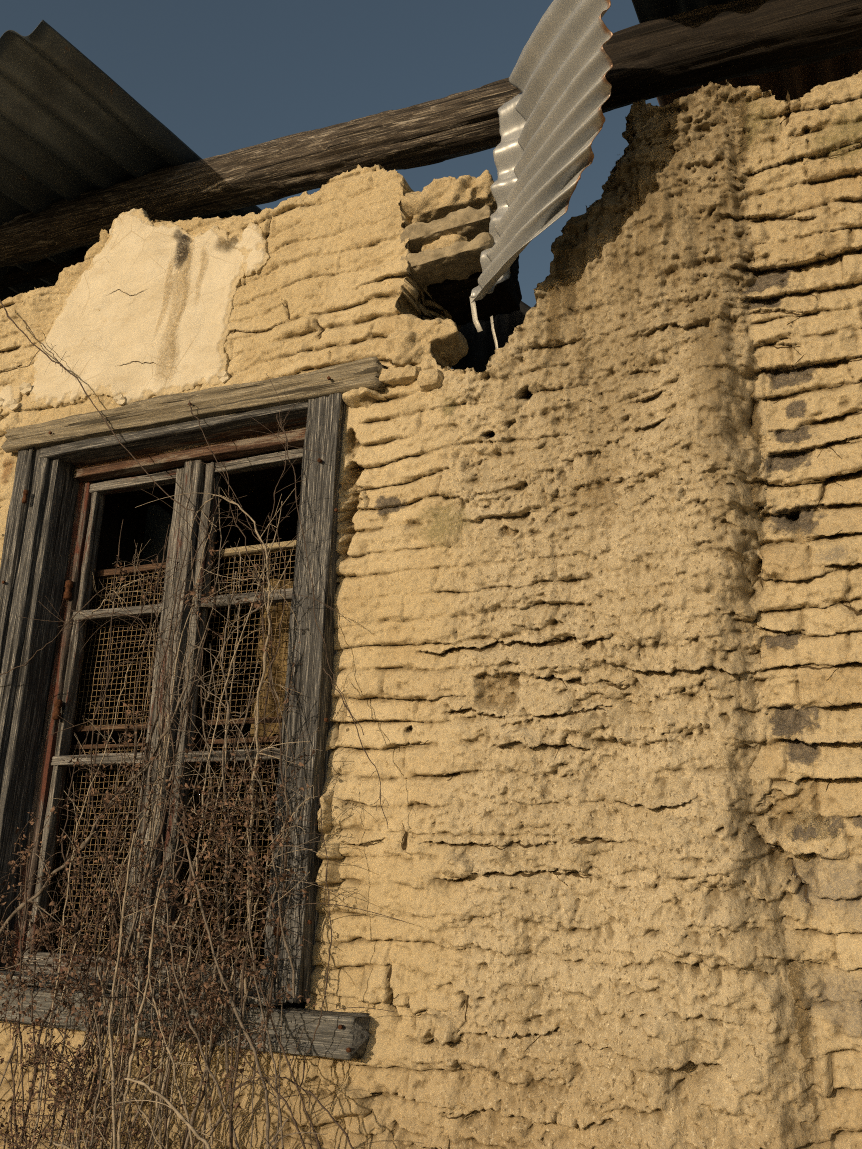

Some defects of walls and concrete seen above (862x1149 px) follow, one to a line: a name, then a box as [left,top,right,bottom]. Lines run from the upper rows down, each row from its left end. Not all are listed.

leakage [175,230,190,266]
leakage [217,236,237,250]
flaking render [0,208,270,421]
crack [787,859,811,905]
crack [387,965,425,1017]
crack [429,995,472,1042]